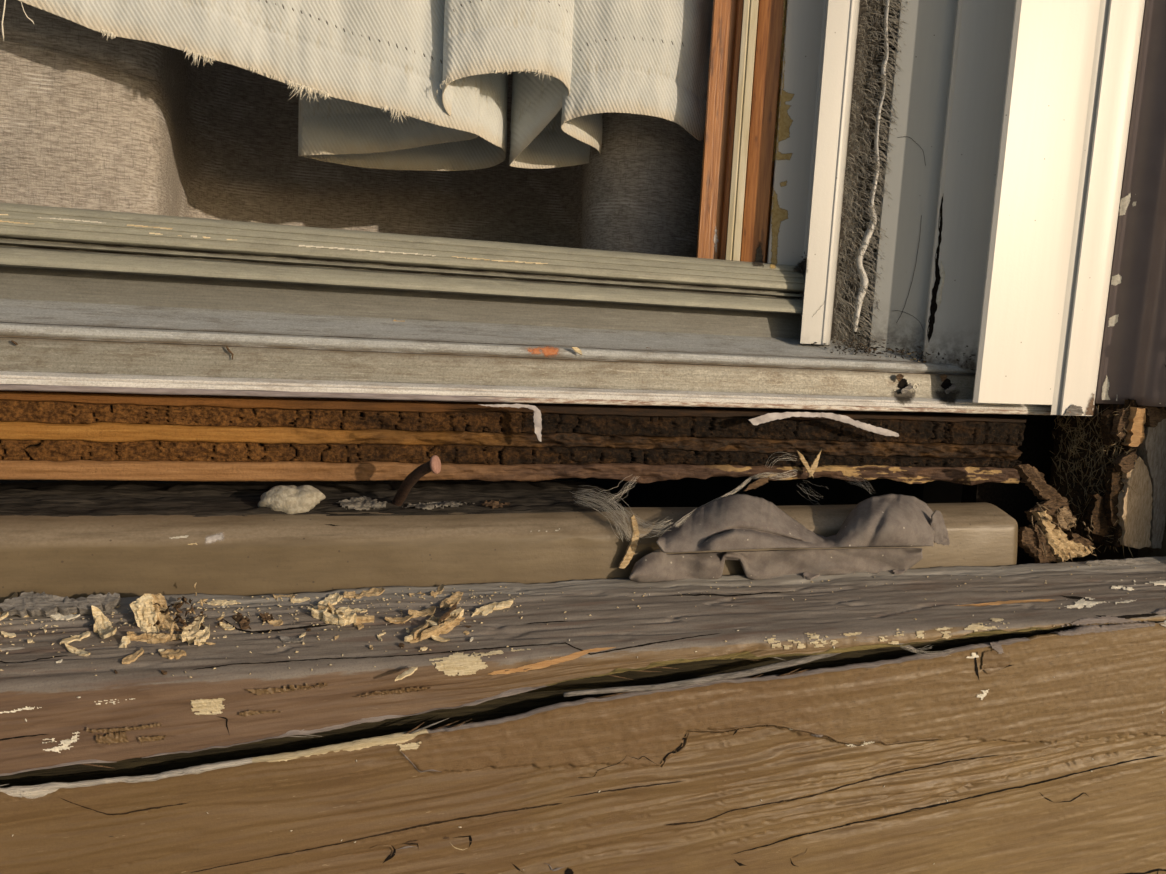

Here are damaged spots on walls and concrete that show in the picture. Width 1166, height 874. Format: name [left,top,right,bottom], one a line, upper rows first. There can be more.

peeling [1102,376,1117,401]
crack [675,590,795,598]
peeling [1049,580,1166,636]
peeling [429,649,531,676]
peeling [764,632,862,649]
peeling [879,618,1013,674]
peeling [191,698,225,715]
crack [0,595,1166,815]
crack [191,733,689,873]
crack [666,755,997,826]
crack [731,755,1163,855]
crack [1125,866,1166,874]